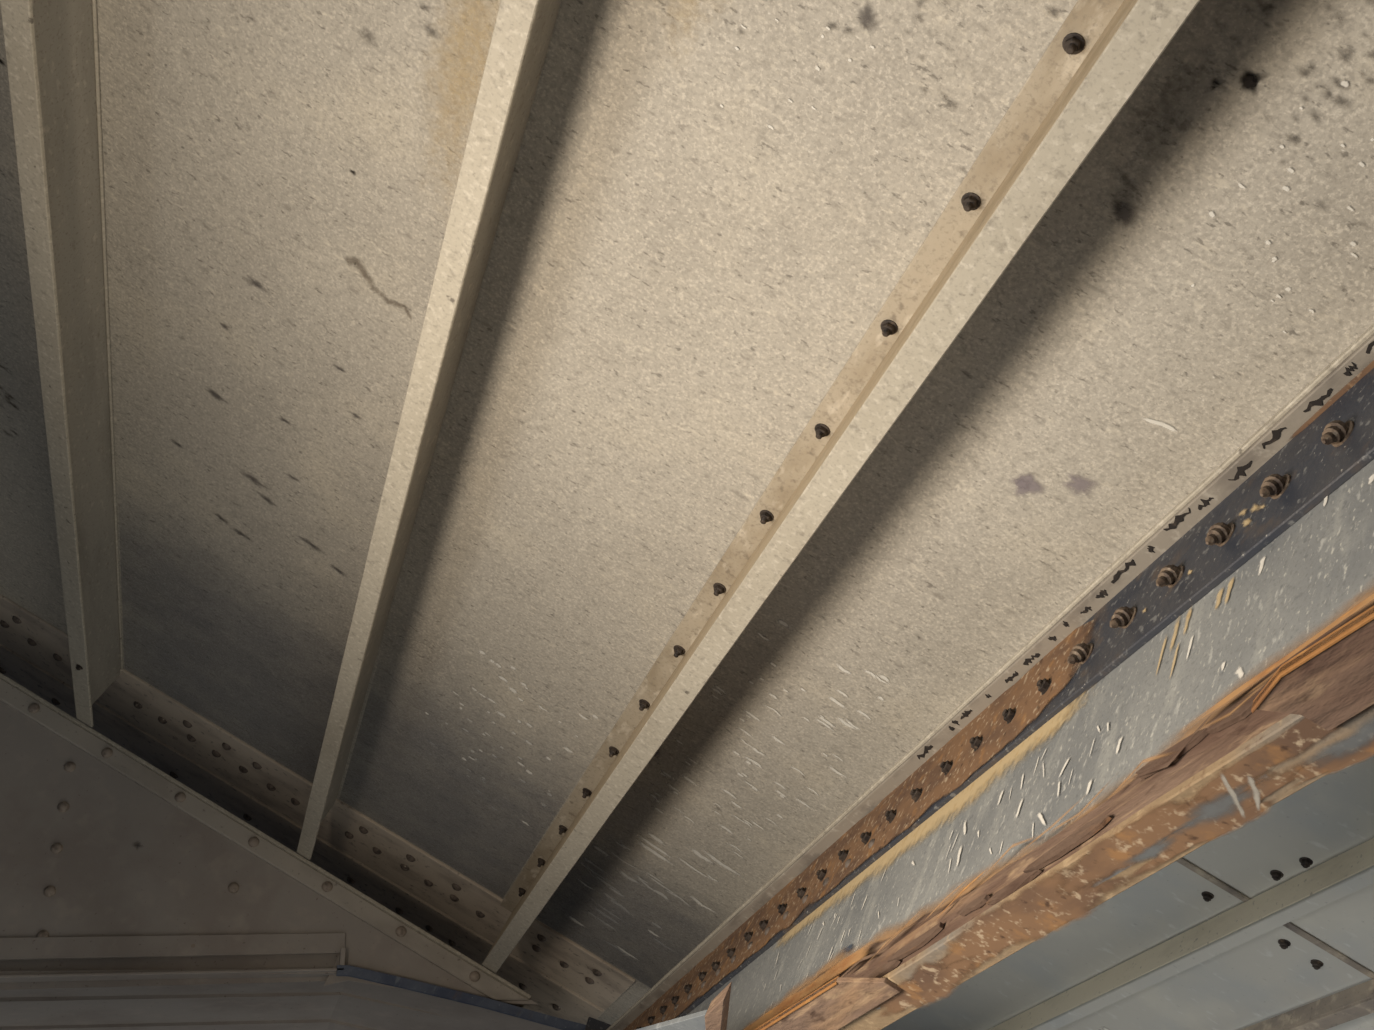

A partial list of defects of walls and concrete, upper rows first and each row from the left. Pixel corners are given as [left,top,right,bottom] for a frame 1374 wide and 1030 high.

peeling [1343,341,1374,376]
peeling [1303,388,1332,412]
peeling [1262,427,1287,449]
peeling [1228,461,1252,481]
peeling [1163,497,1214,531]
peeling [1048,546,1155,641]
peeling [1005,653,1040,683]
peeling [1135,691,1260,780]
rust [624,620,1094,1030]
rust [744,588,1374,1030]
peeling [959,816,1112,917]
peeling [867,922,944,978]